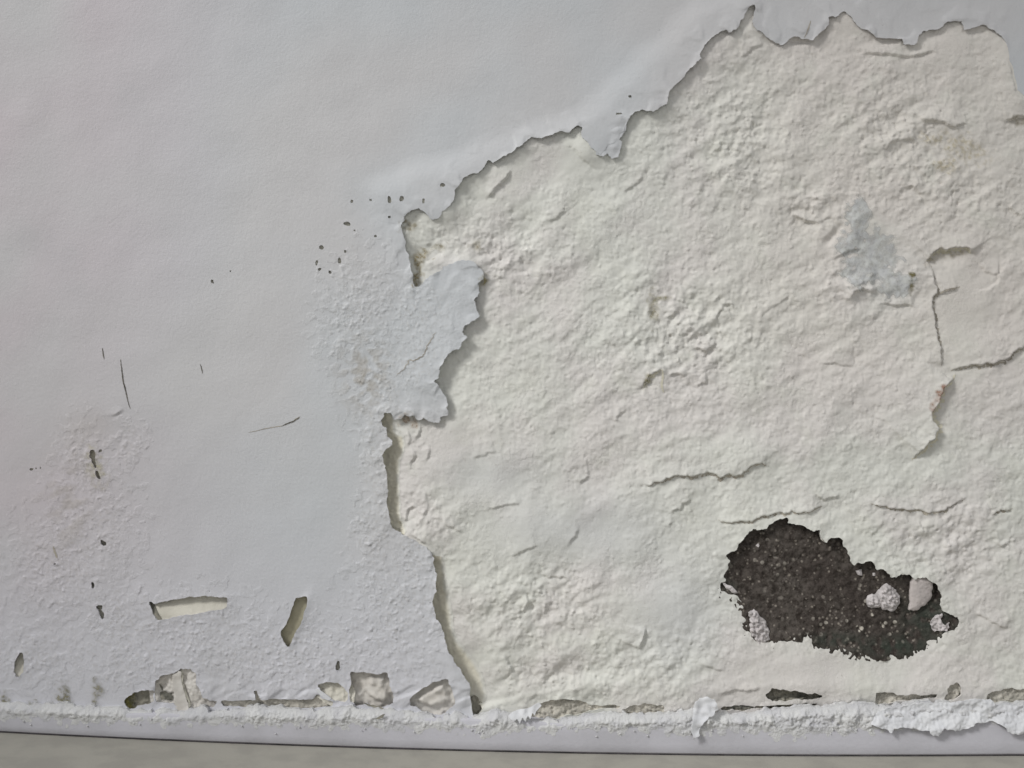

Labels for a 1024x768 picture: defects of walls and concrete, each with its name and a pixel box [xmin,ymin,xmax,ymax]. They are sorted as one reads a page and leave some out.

peeling [388,5,1024,740]
crack [912,248,1023,460]
crack [651,464,766,486]
crack [875,500,963,516]
peeling [149,596,227,620]
peeling [281,596,307,647]
peeling [149,669,215,711]
peeling [316,661,394,719]